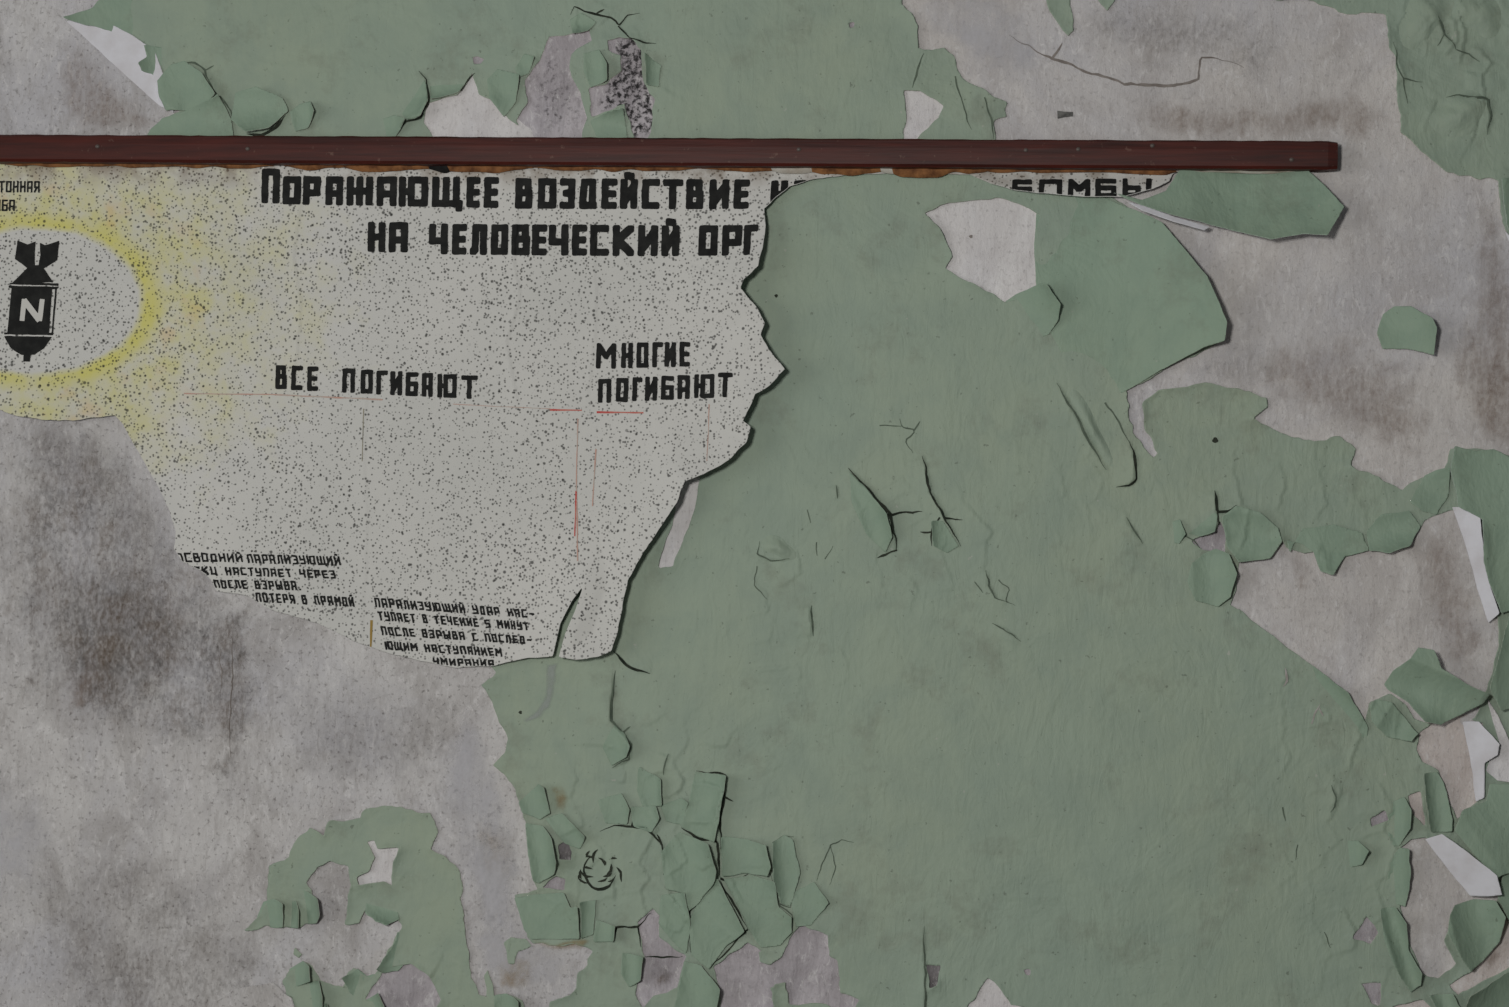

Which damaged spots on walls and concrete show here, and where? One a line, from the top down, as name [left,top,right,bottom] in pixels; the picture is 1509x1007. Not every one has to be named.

peeling [0,0,314,136]
peeling [383,13,661,138]
peeling [850,473,892,552]
peeling [902,0,1509,1007]
peeling [0,410,859,1007]
crack [578,651,793,966]
crack [817,839,850,884]